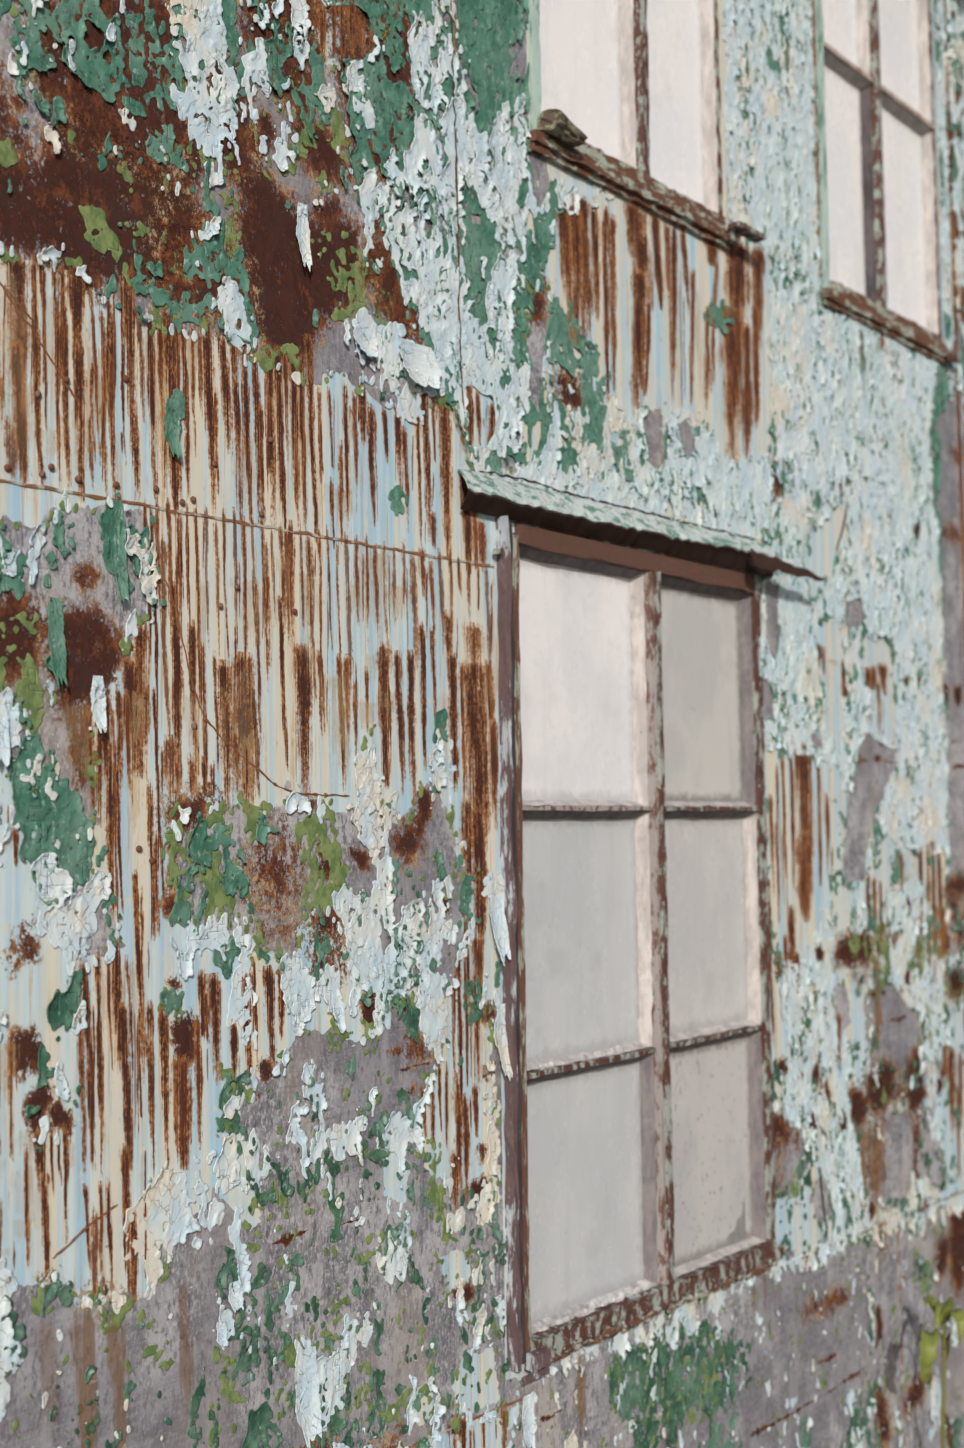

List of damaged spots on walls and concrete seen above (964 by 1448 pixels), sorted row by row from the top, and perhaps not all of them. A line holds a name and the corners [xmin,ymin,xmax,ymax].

peeling [0,235,93,285]
peeling [78,205,130,263]
corrosion [527,194,766,463]
peeling [934,0,964,350]
peeling [388,485,409,516]
corrosion [0,0,499,1321]
peeling [0,489,167,1152]
peeling [157,986,184,1023]
corrosion [768,741,899,1037]
corrosion [898,841,964,1006]
corrosion [773,1041,964,1298]
corrosion [445,1403,507,1448]